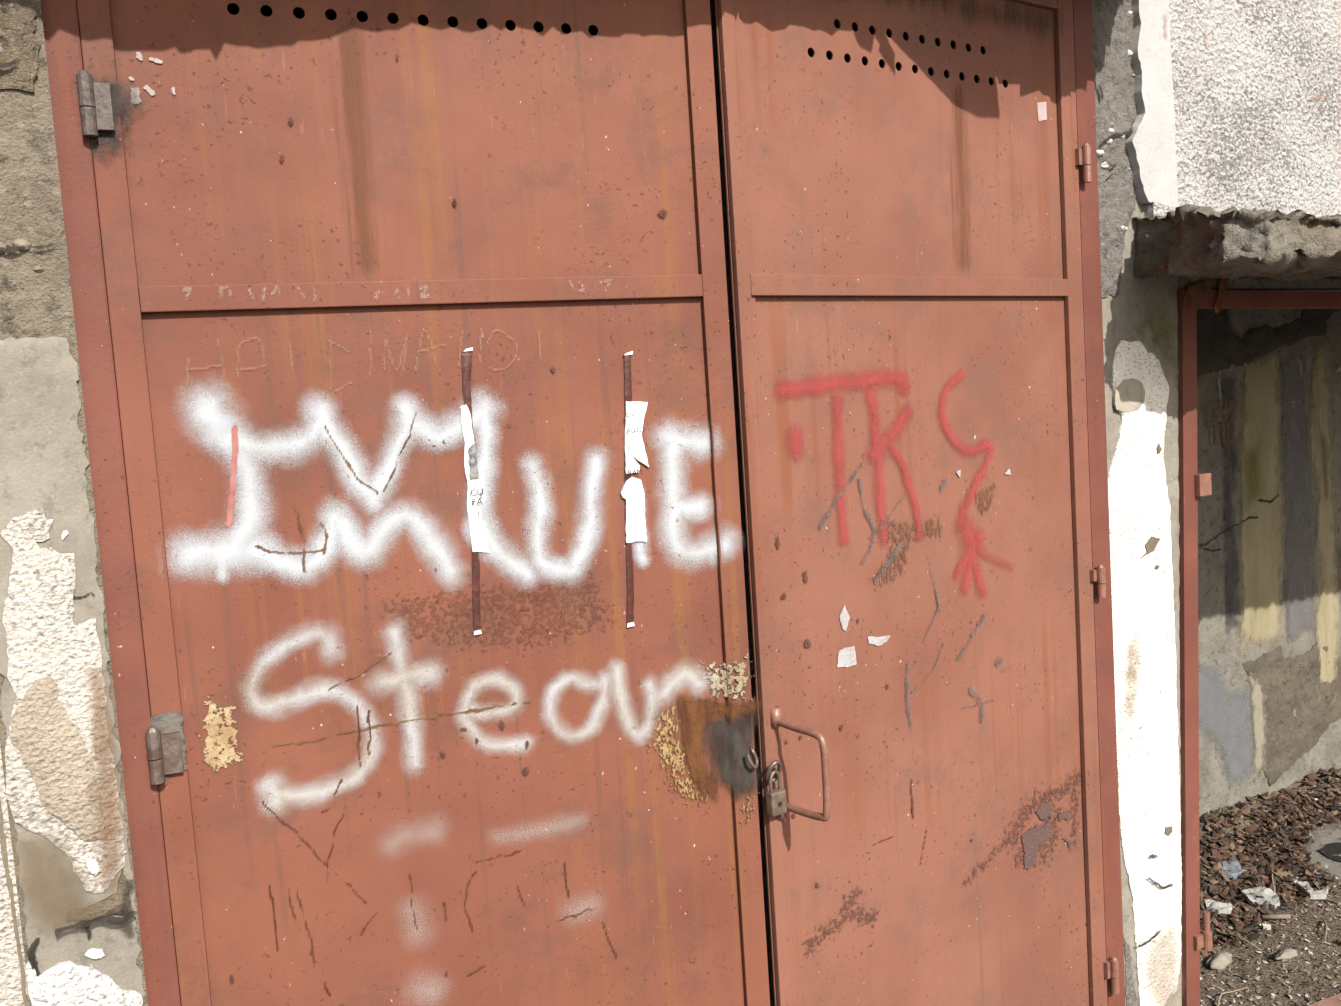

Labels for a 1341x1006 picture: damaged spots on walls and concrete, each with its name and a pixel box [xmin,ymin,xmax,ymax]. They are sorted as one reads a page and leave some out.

spalling [1092,0,1137,298]
peeling [0,508,136,934]
corrosion [647,653,760,827]
peeling [1108,340,1182,1006]
peeling [25,948,143,1006]